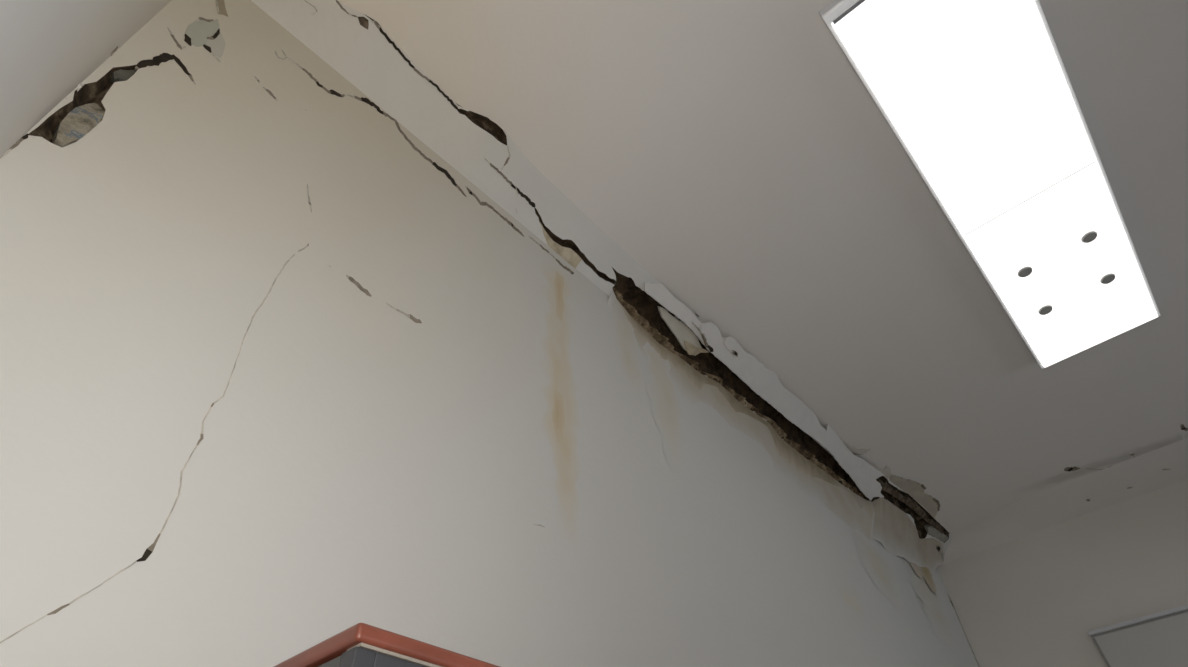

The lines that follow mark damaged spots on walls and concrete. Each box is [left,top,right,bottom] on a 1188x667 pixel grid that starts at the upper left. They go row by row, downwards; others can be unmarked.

crack [0,133,29,158]
spalling [29,0,228,147]
crack [0,243,309,644]
crack [329,265,422,323]
leakage [538,248,583,551]
flaking render [534,208,949,562]
leakage [607,290,962,656]